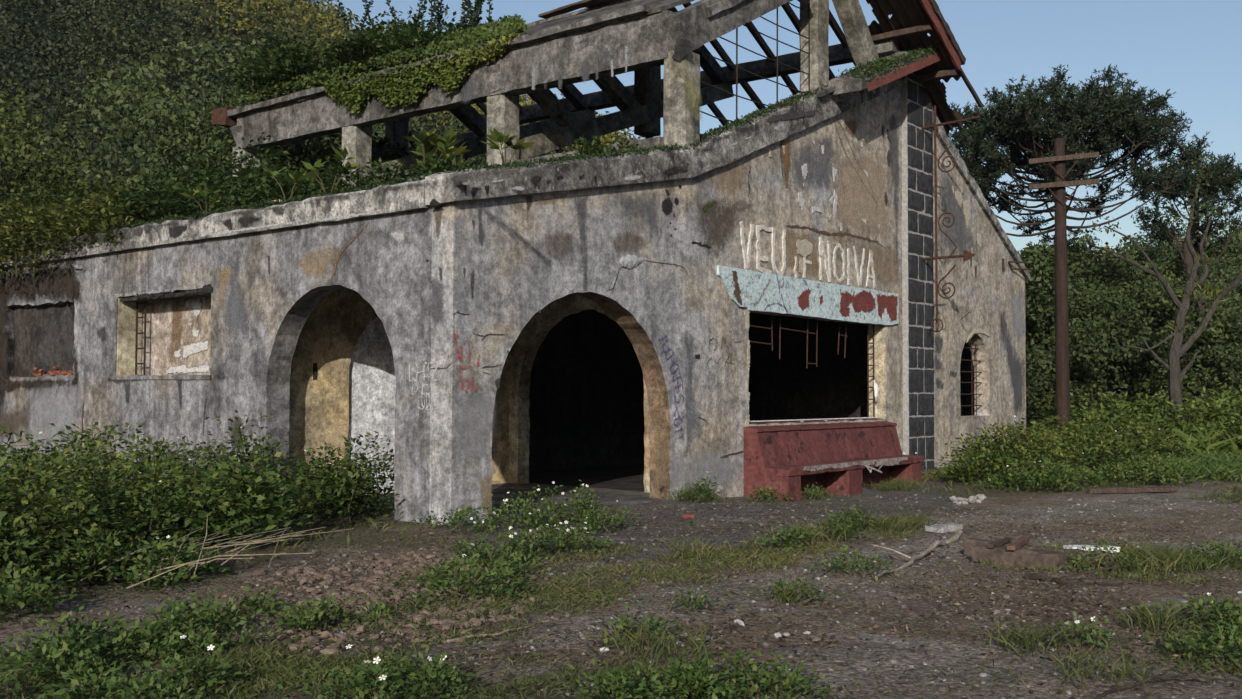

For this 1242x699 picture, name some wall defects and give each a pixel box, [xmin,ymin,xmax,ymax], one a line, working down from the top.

damp [793,138,833,186]
peeling [796,239,813,274]
damp [1000,292,1025,411]